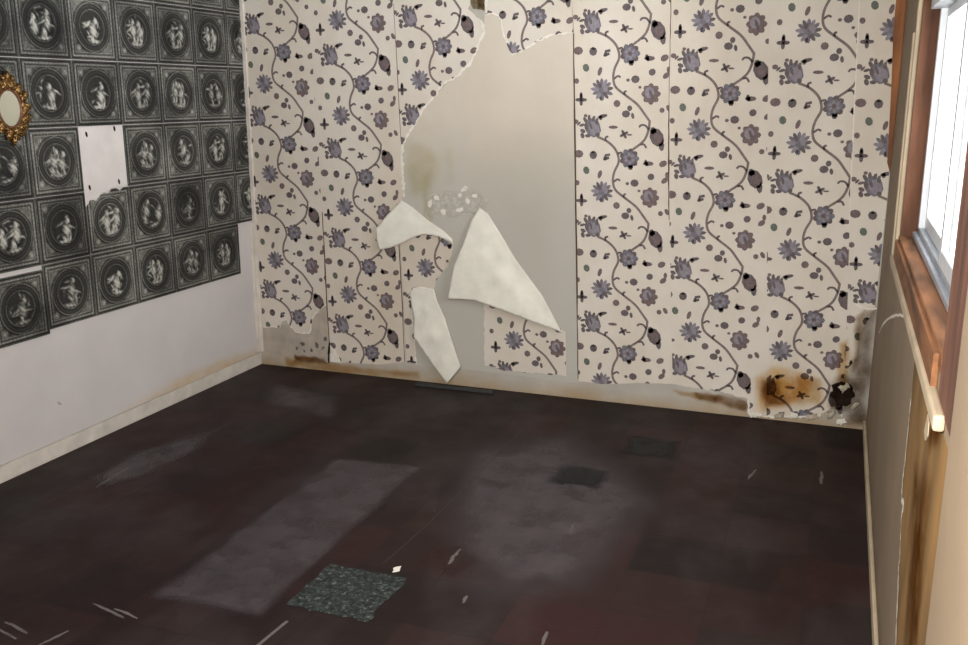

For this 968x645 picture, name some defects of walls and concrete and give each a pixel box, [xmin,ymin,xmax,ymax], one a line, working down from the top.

peeling [78,126,127,207]
peeling [428,186,477,215]
damp [763,382,779,404]